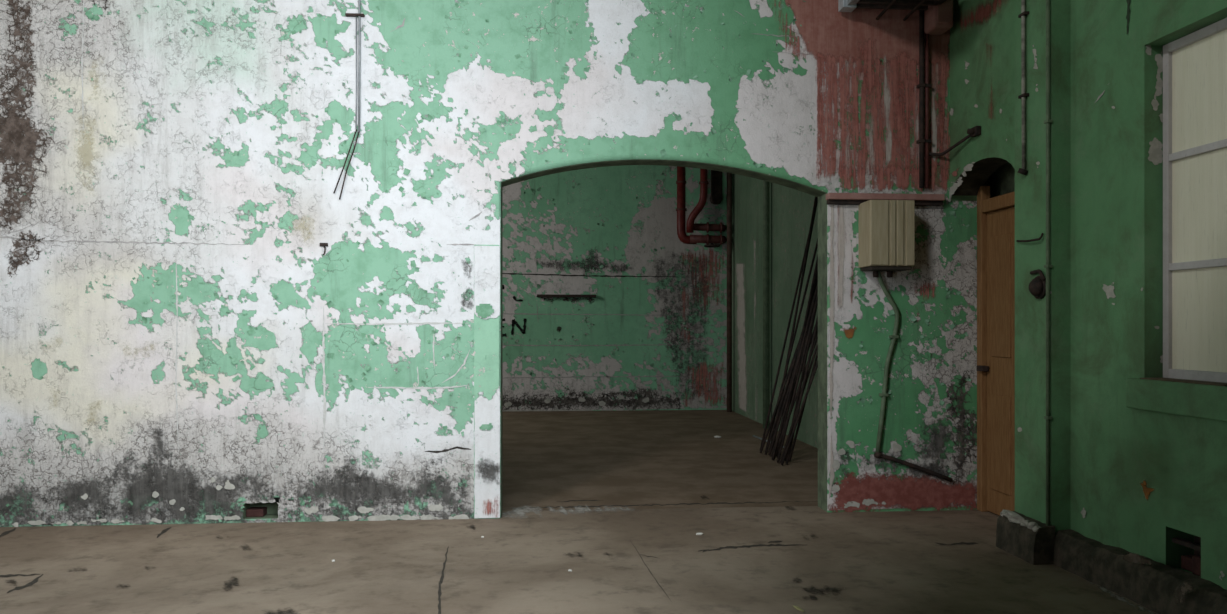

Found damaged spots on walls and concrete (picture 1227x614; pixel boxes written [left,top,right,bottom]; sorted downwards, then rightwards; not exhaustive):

water stain [0,0,55,277]
corrosion [774,0,1002,192]
peeling [729,0,977,510]
water stain [502,252,709,410]
water stain [0,428,273,538]
water stain [263,459,475,529]
water stain [477,461,499,481]
water stain [828,371,977,512]
flaking render [1000,510,1041,532]